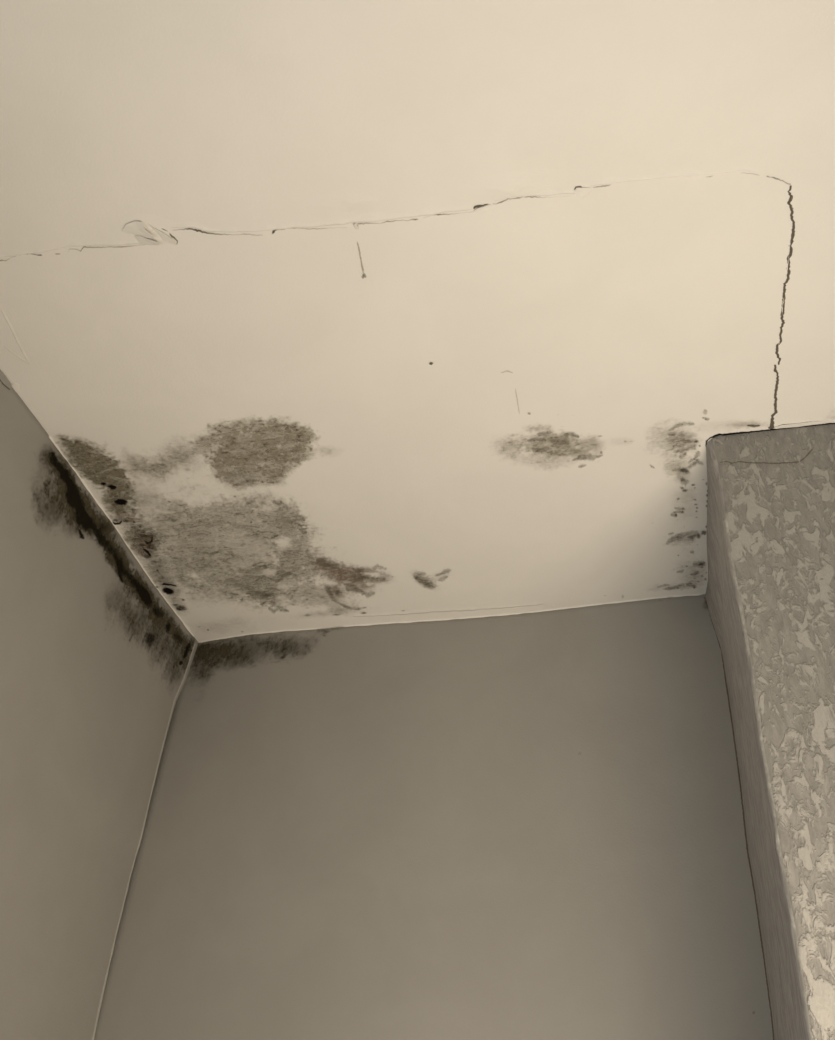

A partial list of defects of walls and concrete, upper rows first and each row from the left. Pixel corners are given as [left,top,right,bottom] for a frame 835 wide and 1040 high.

crack [705,186,835,464]
water stain [196,419,313,486]
water stain [503,431,596,463]
water stain [664,417,709,491]
water stain [34,438,386,682]